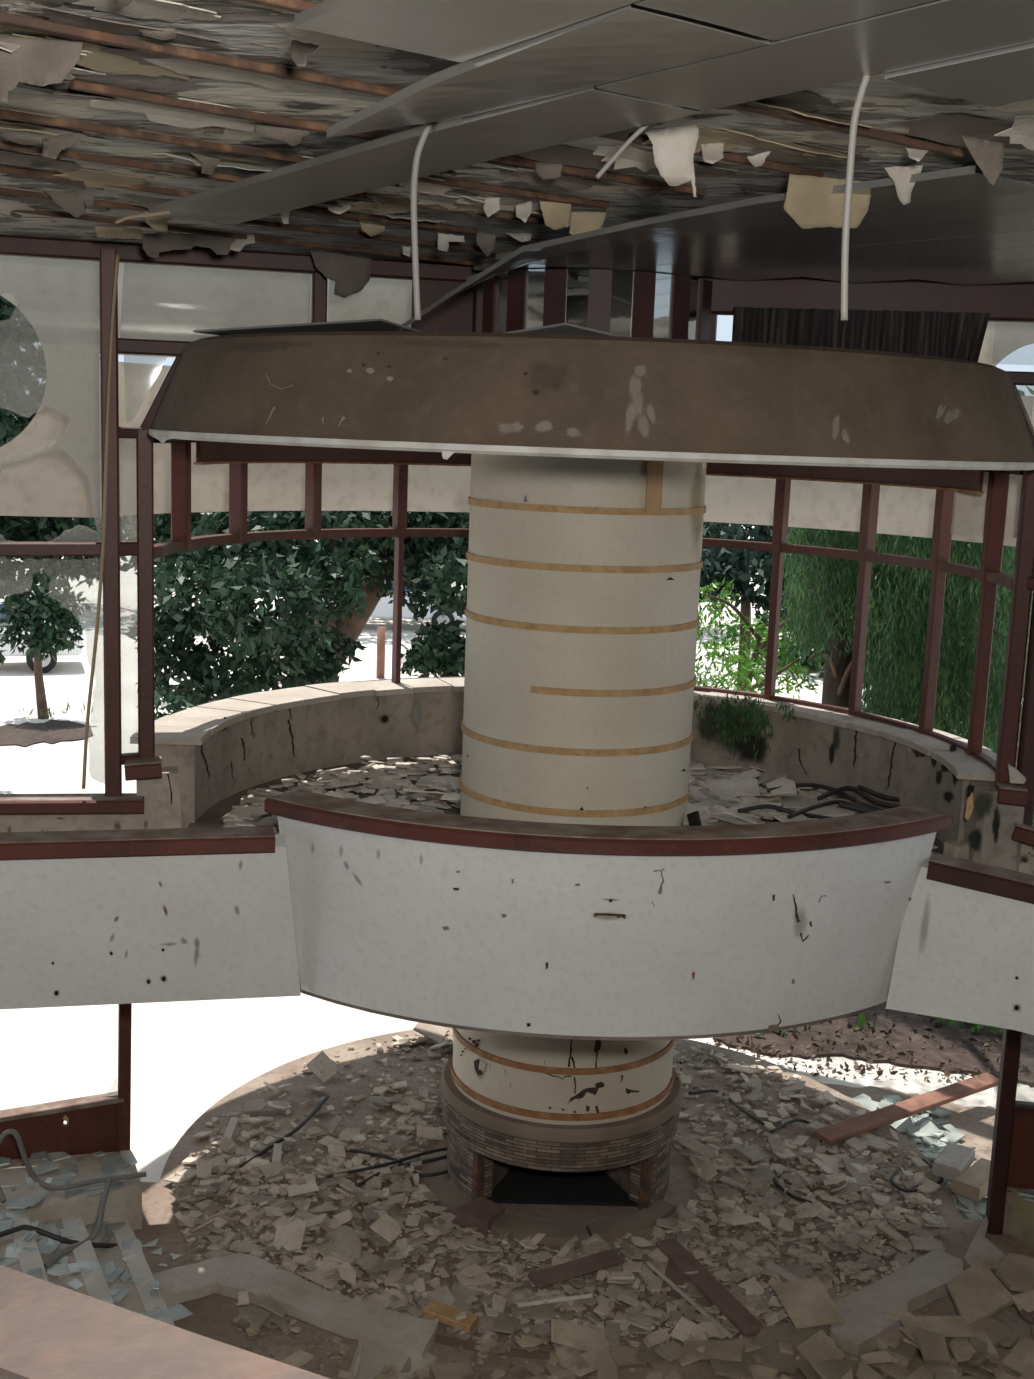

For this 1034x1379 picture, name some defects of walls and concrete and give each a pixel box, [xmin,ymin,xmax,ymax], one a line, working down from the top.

peeling [0,121,255,258]
peeling [319,90,1034,257]
crack [200,717,254,782]
crack [287,708,295,757]
crack [853,730,896,790]
peeling [460,1037,485,1076]
peeling [548,1040,605,1113]